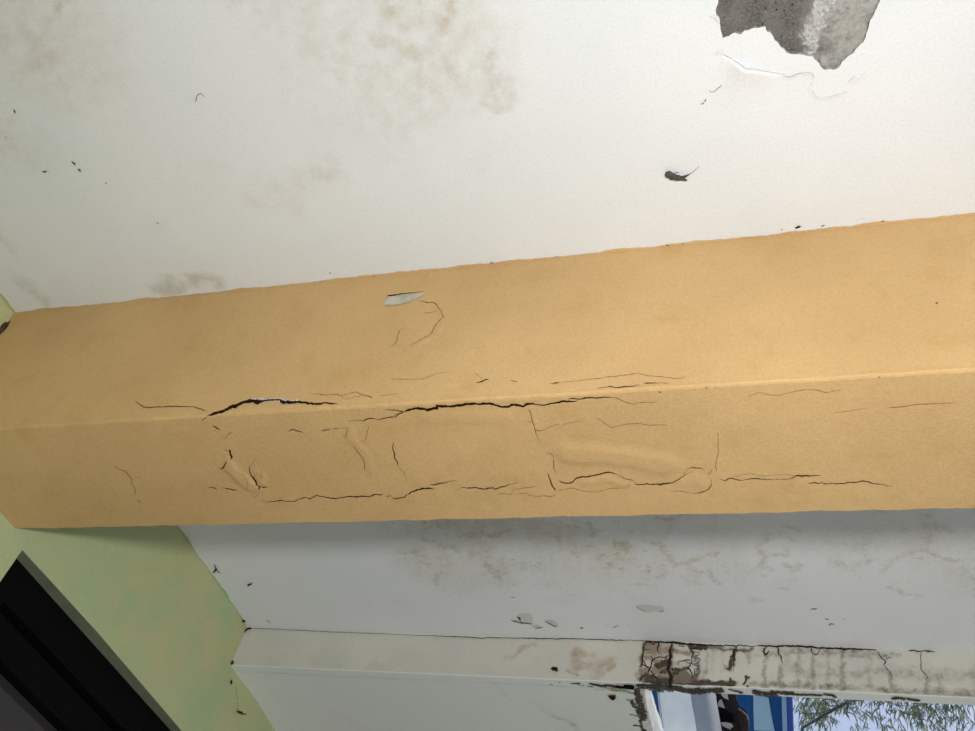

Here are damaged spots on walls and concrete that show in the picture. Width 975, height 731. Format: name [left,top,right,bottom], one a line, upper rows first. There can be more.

flaking render [705,0,880,115]
peeling [383,291,424,306]
crack [137,373,892,503]
peeling [511,613,558,629]
crack [255,627,934,688]